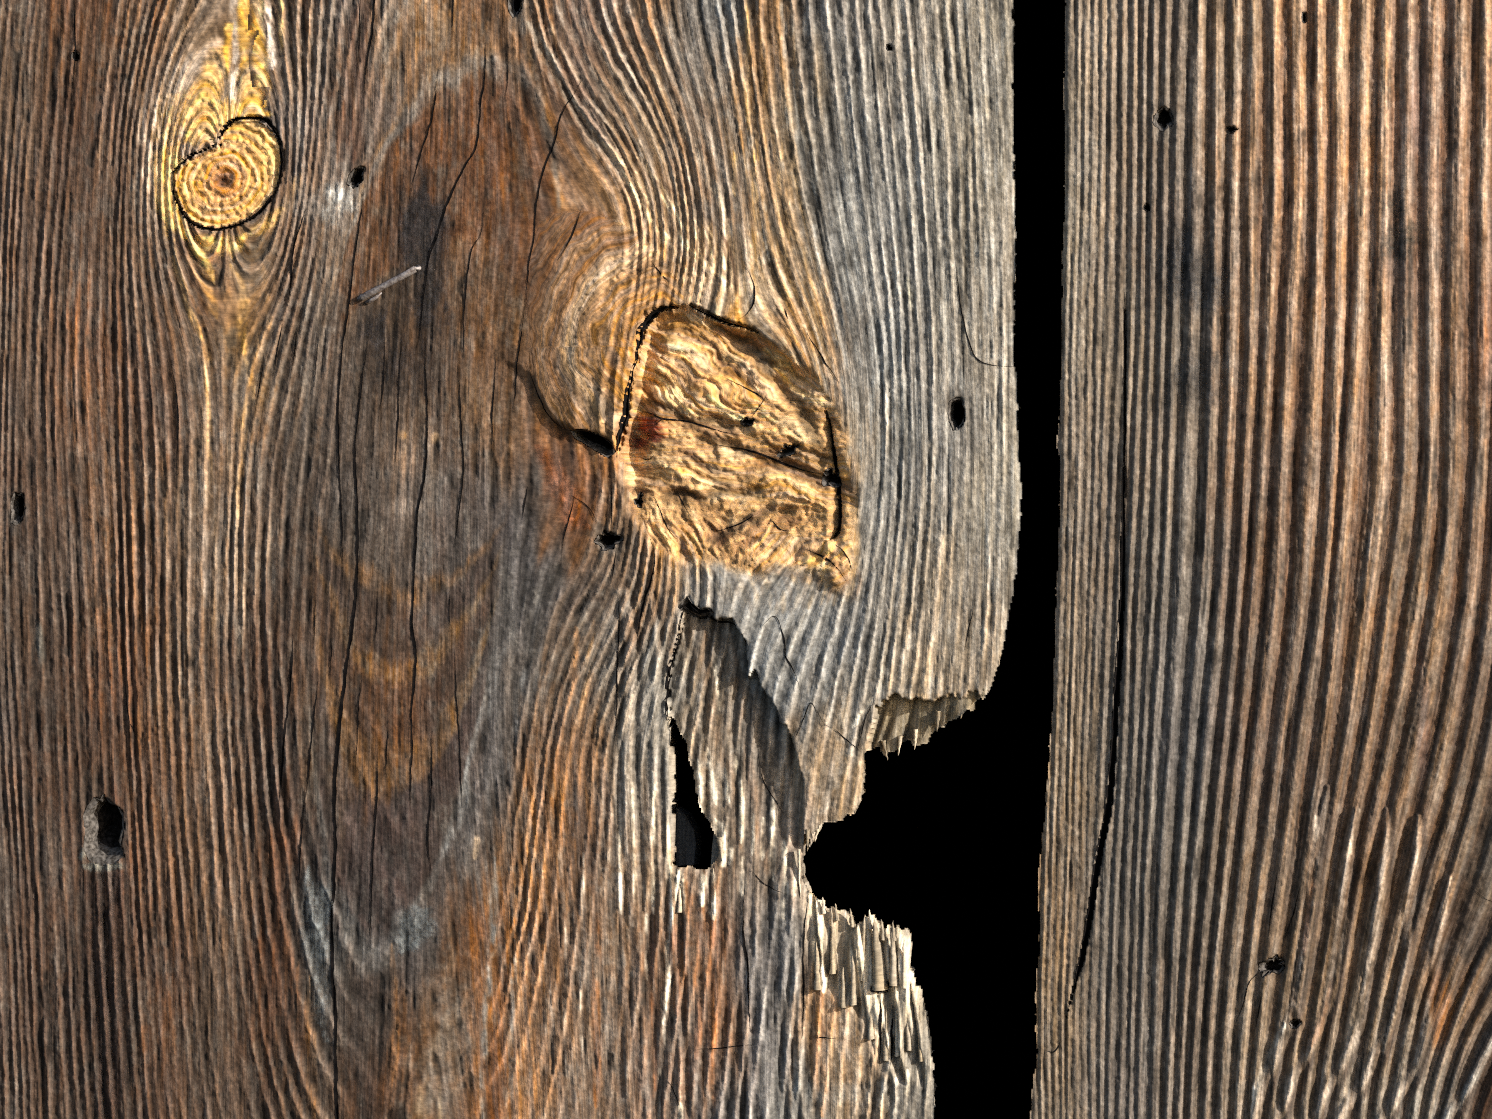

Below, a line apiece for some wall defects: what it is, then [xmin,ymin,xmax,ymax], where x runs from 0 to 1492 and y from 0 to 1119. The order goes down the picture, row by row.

crack [172,47,583,1119]
crack [561,261,852,729]
crack [666,603,874,750]
crack [1049,292,1127,1053]